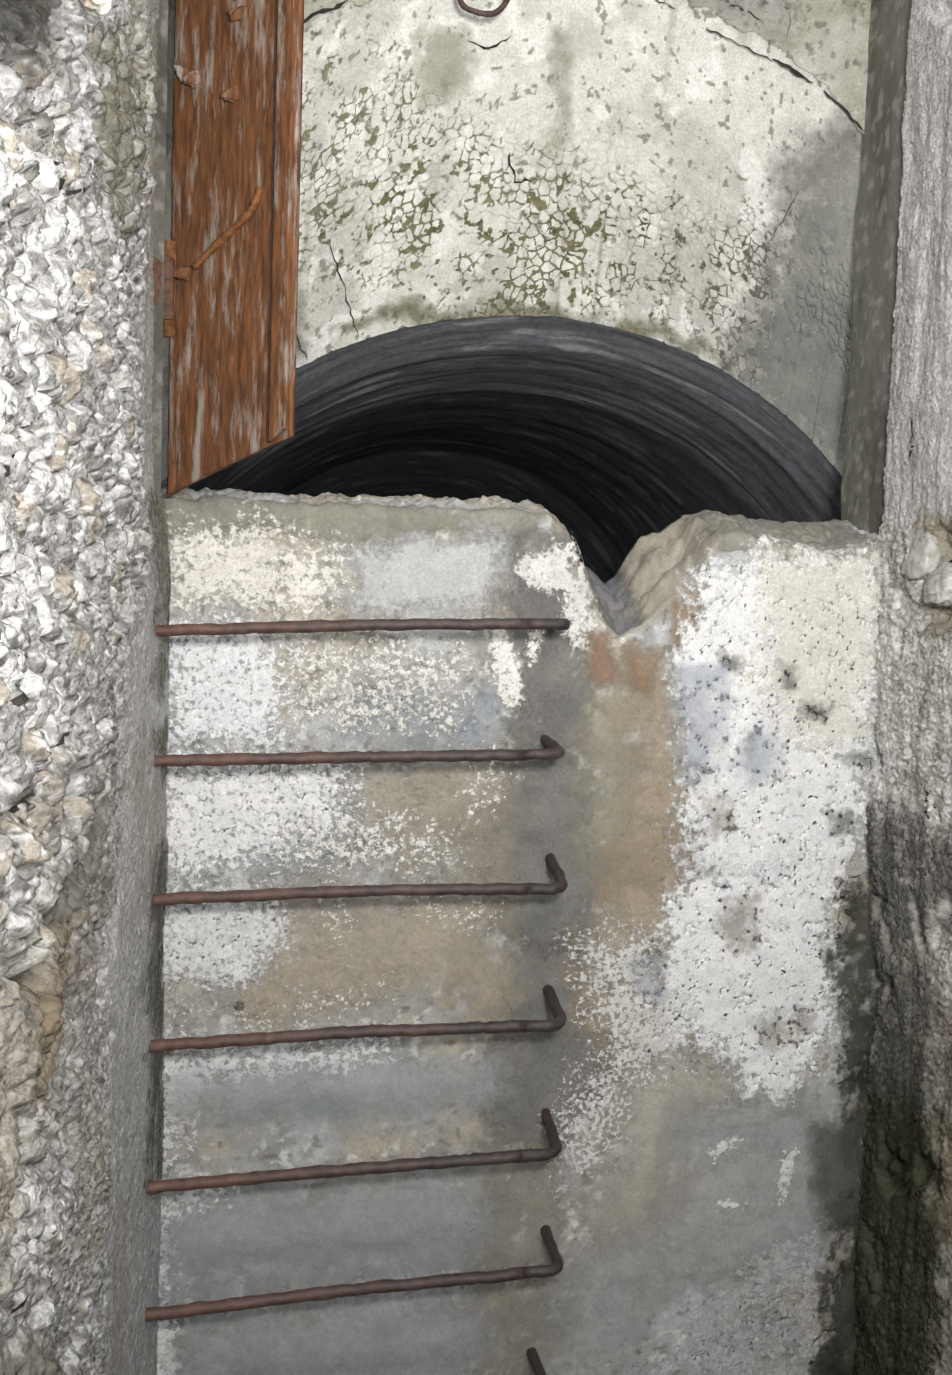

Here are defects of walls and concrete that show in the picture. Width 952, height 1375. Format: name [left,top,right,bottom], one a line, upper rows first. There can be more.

crack [304,0,348,23]
crack [468,36,511,50]
crack [506,153,529,183]
crack [767,192,798,246]
spalling [901,509,952,639]
water stain [148,848,167,1033]
water stain [153,497,738,1375]
peeling [157,499,883,1375]
water stain [723,902,756,942]
water stain [147,1052,165,1171]
water stain [809,811,952,1375]